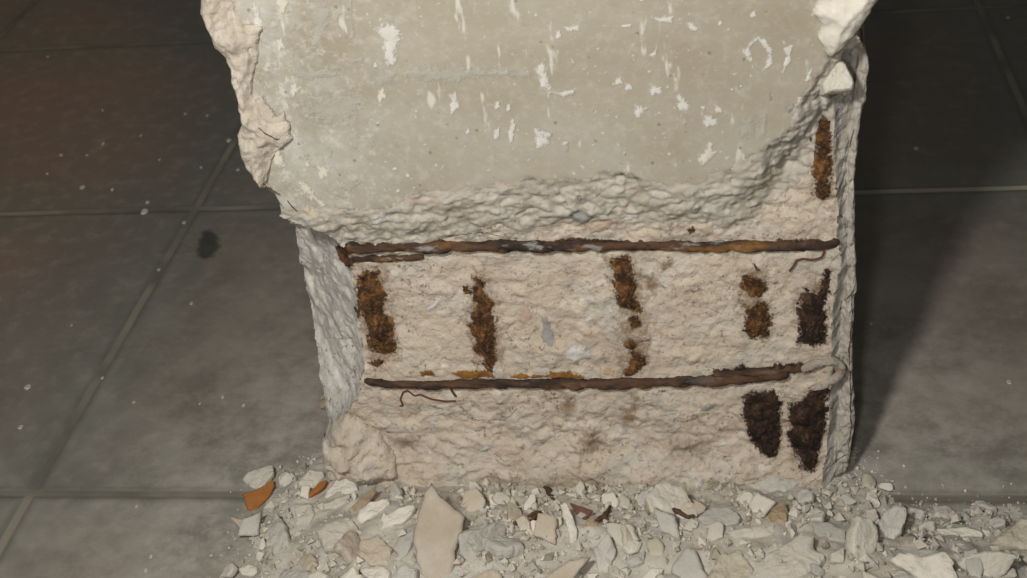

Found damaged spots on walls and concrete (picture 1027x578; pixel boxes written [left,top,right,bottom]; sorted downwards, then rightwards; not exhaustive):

corrosion [810,115,835,200]
corrosion [335,242,397,367]
corrosion [452,277,499,379]
corrosion [510,371,585,379]
spalling [280,0,878,554]
corrosion [609,254,656,378]
corrosion [738,264,773,340]
corrosion [770,361,811,374]
corrosion [795,268,832,348]
corrosion [740,388,831,473]